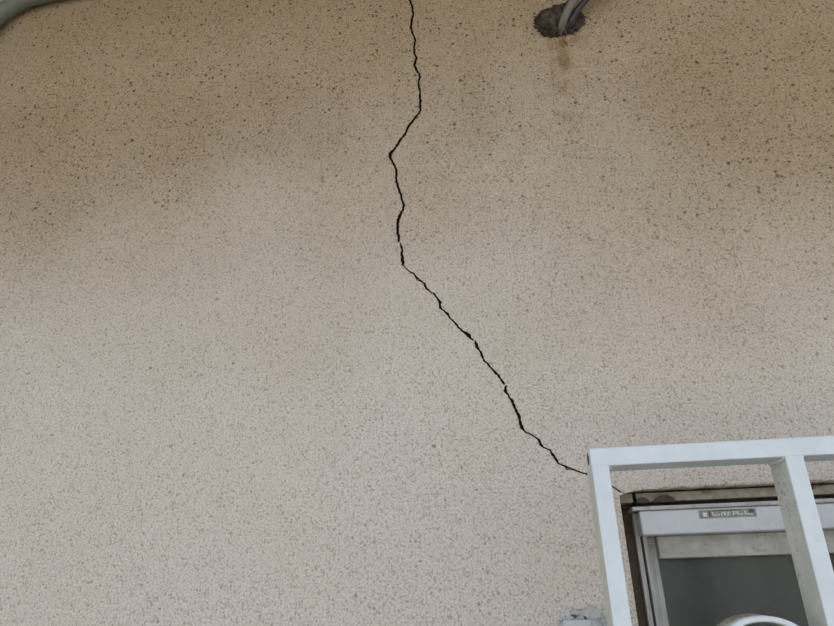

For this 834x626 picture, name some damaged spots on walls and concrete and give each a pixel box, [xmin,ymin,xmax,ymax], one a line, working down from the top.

crack [388,0,588,476]